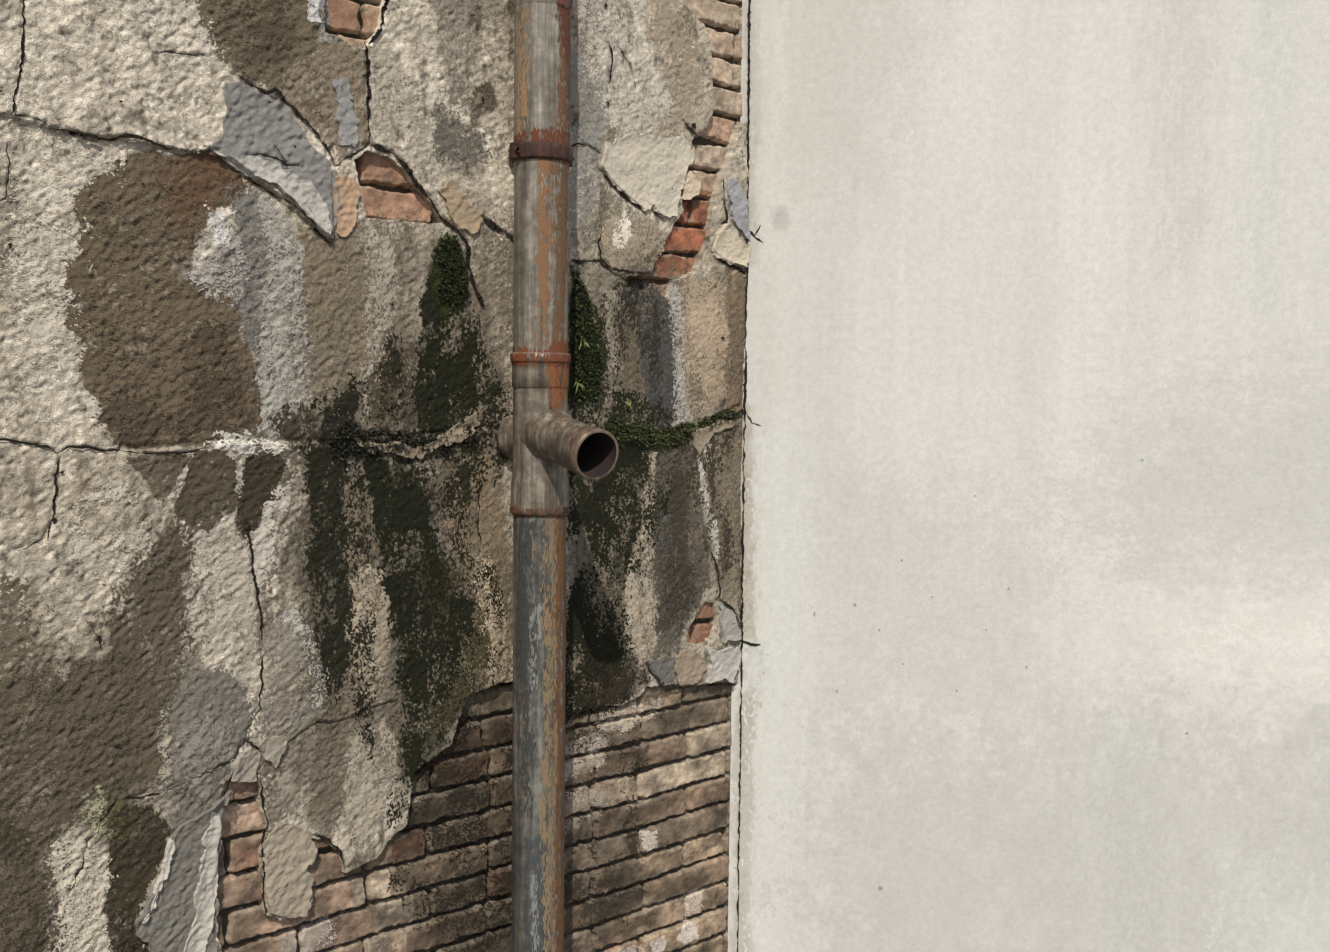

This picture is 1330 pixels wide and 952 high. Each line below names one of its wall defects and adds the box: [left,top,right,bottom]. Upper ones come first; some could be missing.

crack [0,0,514,410]
flaking render [211,78,483,237]
corrosion [510,158,571,410]
spalling [601,0,751,296]
crack [0,438,211,551]
damp [0,0,552,952]
crack [475,475,483,540]
damp [564,0,1330,952]
crack [68,521,397,915]
spalling [134,682,513,952]
corrosion [510,506,570,952]
spalling [563,602,742,952]